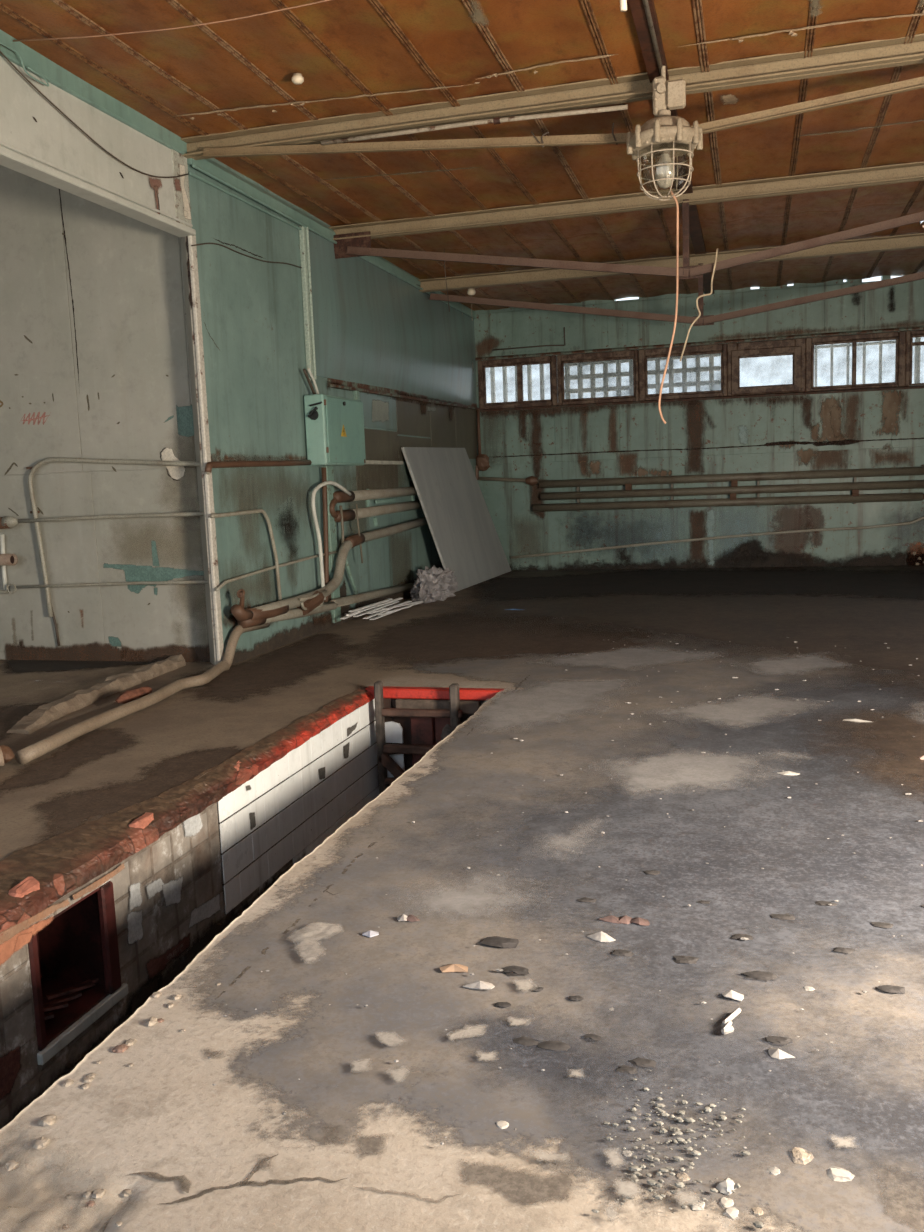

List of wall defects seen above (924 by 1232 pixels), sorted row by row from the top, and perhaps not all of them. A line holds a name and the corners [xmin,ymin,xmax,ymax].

rust [482,400,712,518]
rust [813,395,859,470]
rust [690,511,706,562]
rust [771,506,824,559]
peeling [104,541,204,595]
leakage [611,753,765,792]
spalling [0,699,379,1129]
leakage [358,1136,385,1155]
leakage [463,1024,924,1232]
spalling [65,1189,106,1208]
crack [99,1212,116,1232]
crack [132,1154,347,1204]